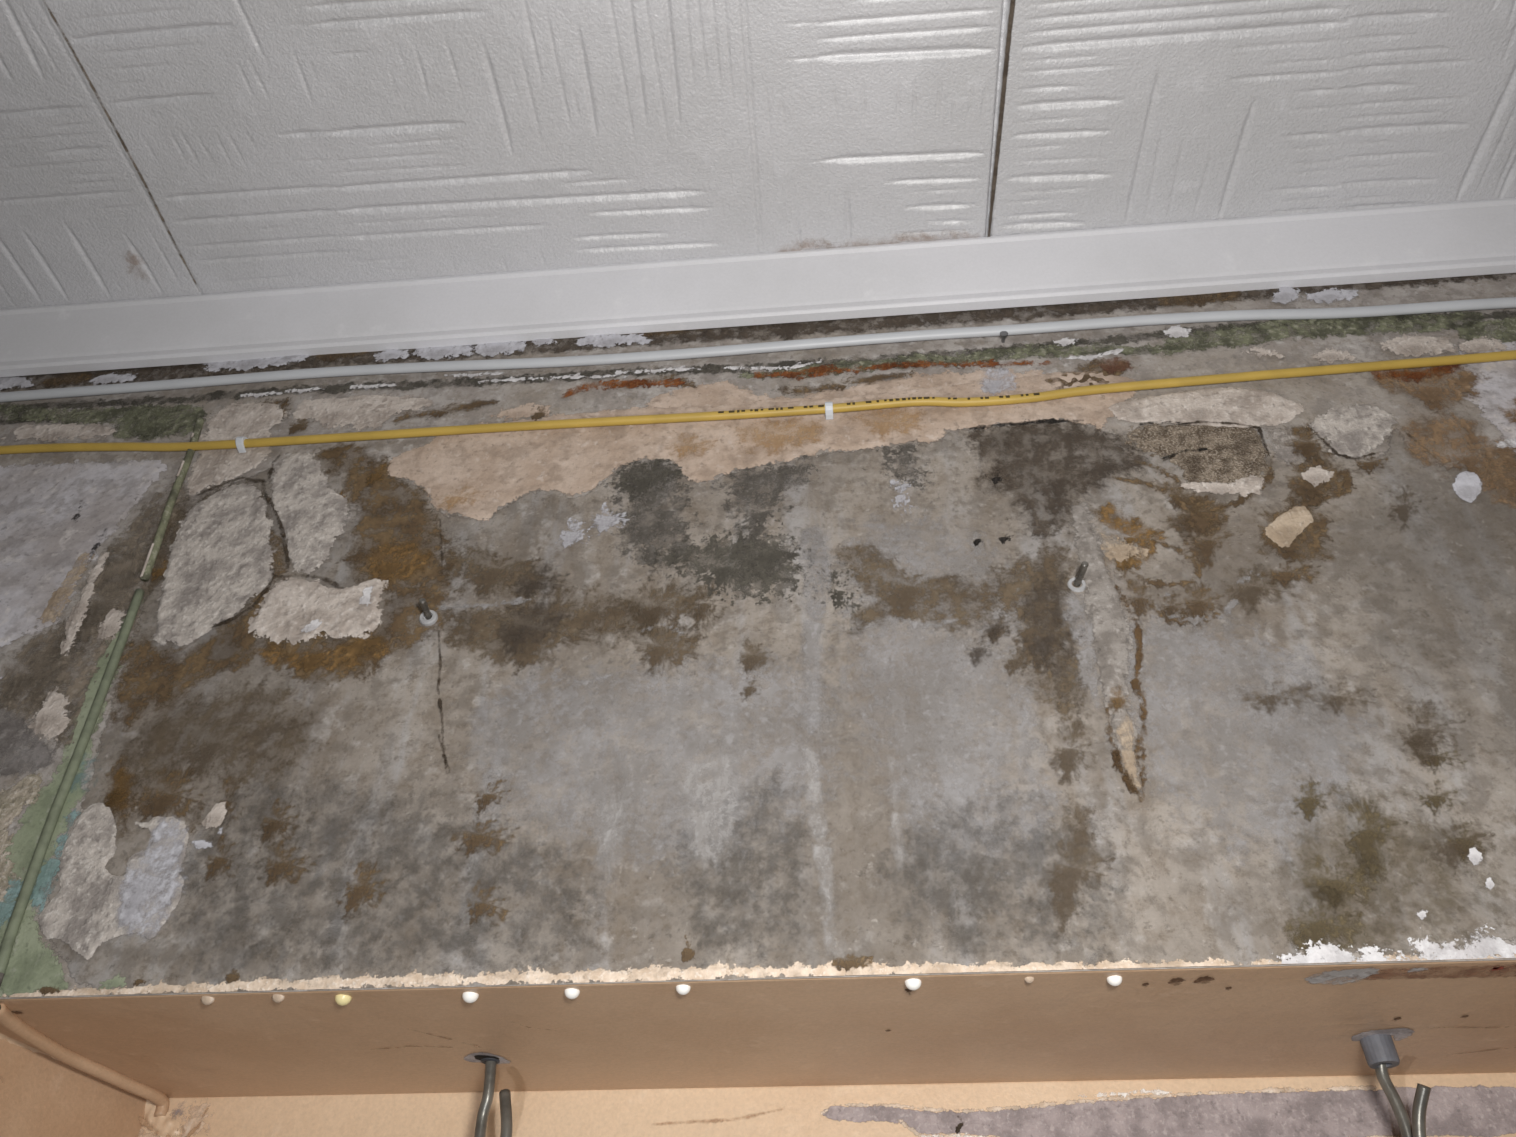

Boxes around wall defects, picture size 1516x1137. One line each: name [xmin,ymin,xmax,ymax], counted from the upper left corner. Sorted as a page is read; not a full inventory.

crack [72,506,100,557]
crack [198,461,344,627]
leakage [877,441,930,511]
leakage [966,418,1207,538]
crack [437,633,448,766]
leakage [439,455,1008,801]
spalling [0,310,1516,1014]
leakage [1004,648,1026,675]
leakage [1294,782,1335,821]
leakage [1407,702,1463,815]
leakage [1269,800,1516,964]
spalling [464,1052,511,1064]